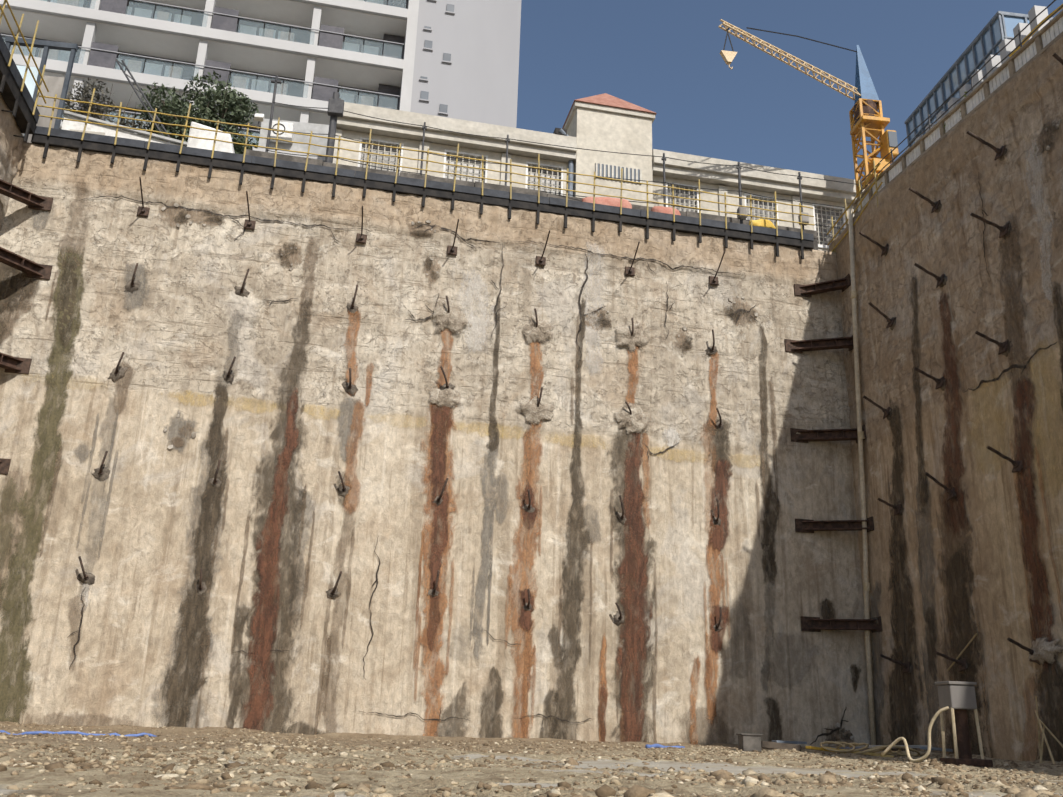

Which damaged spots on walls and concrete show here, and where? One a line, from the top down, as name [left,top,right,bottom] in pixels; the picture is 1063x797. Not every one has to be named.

crack [73,195,371,242]
leakage [0,248,84,723]
leakage [163,383,229,728]
corrosion [227,238,318,733]
corrosion [414,405,456,737]
corrosion [505,421,542,738]
leakage [540,299,593,740]
corrosion [598,427,658,743]
corrosion [690,353,732,745]
leakage [756,326,780,581]
leakage [766,698,783,742]
corrosion [936,293,991,756]